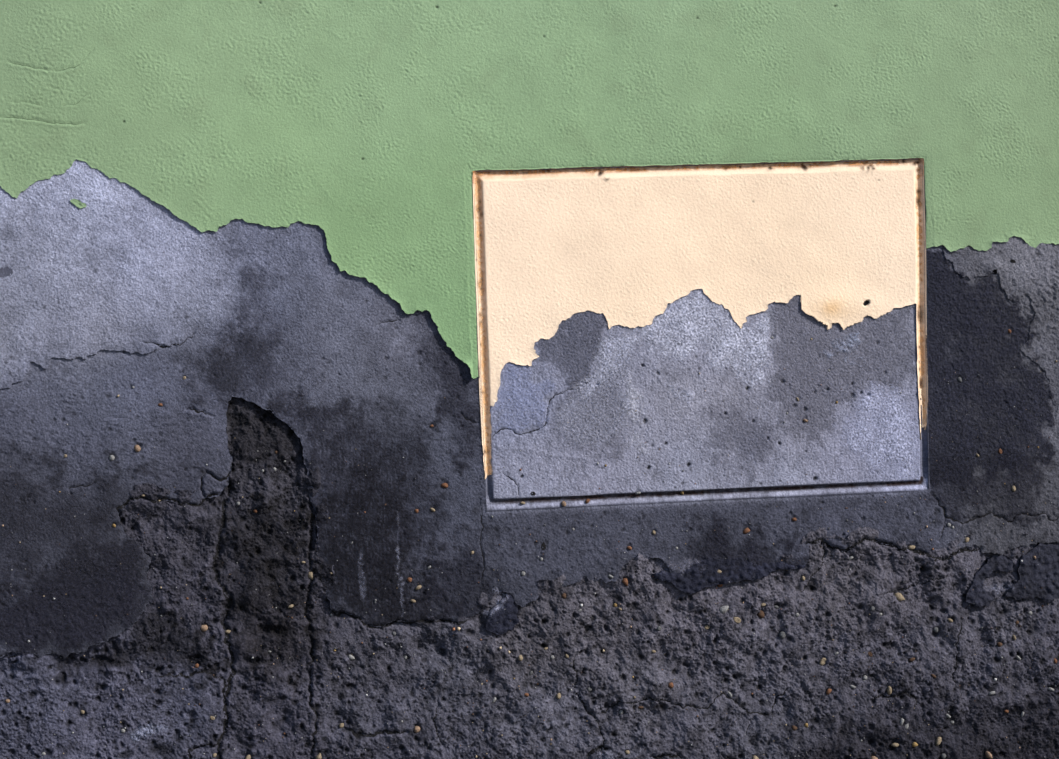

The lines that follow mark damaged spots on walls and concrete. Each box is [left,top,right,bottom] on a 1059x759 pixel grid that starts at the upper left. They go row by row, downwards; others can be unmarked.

water stain [0,481,220,678]
crack [116,463,236,759]
water stain [268,394,503,626]
crack [304,508,470,759]
flaking render [0,158,1059,759]
water stain [848,250,1055,524]